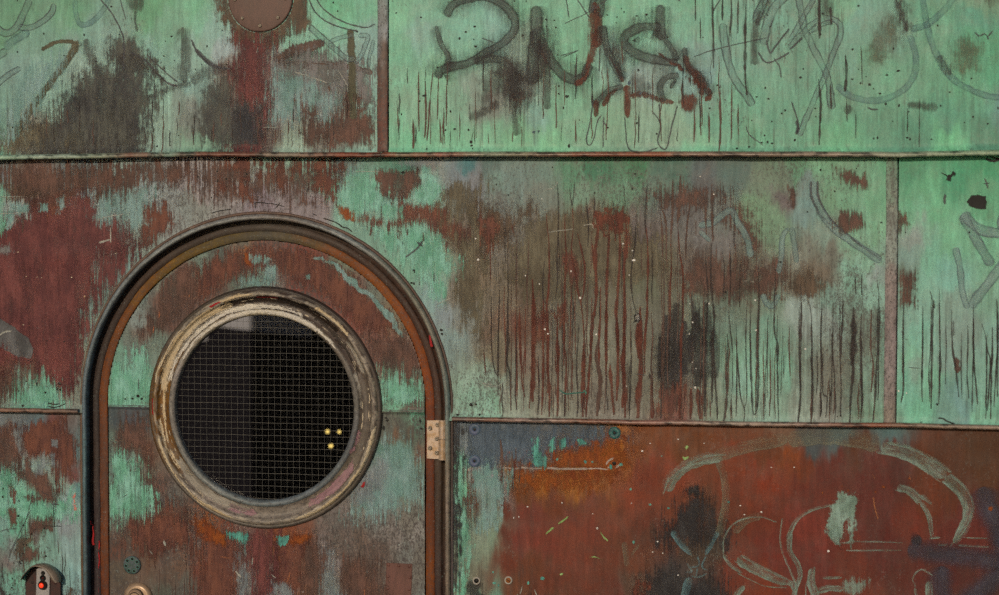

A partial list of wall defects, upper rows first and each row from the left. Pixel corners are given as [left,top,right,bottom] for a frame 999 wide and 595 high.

rust [214,29,282,152]
rust [338,205,355,222]
rust [508,434,629,496]
rust [463,470,483,530]